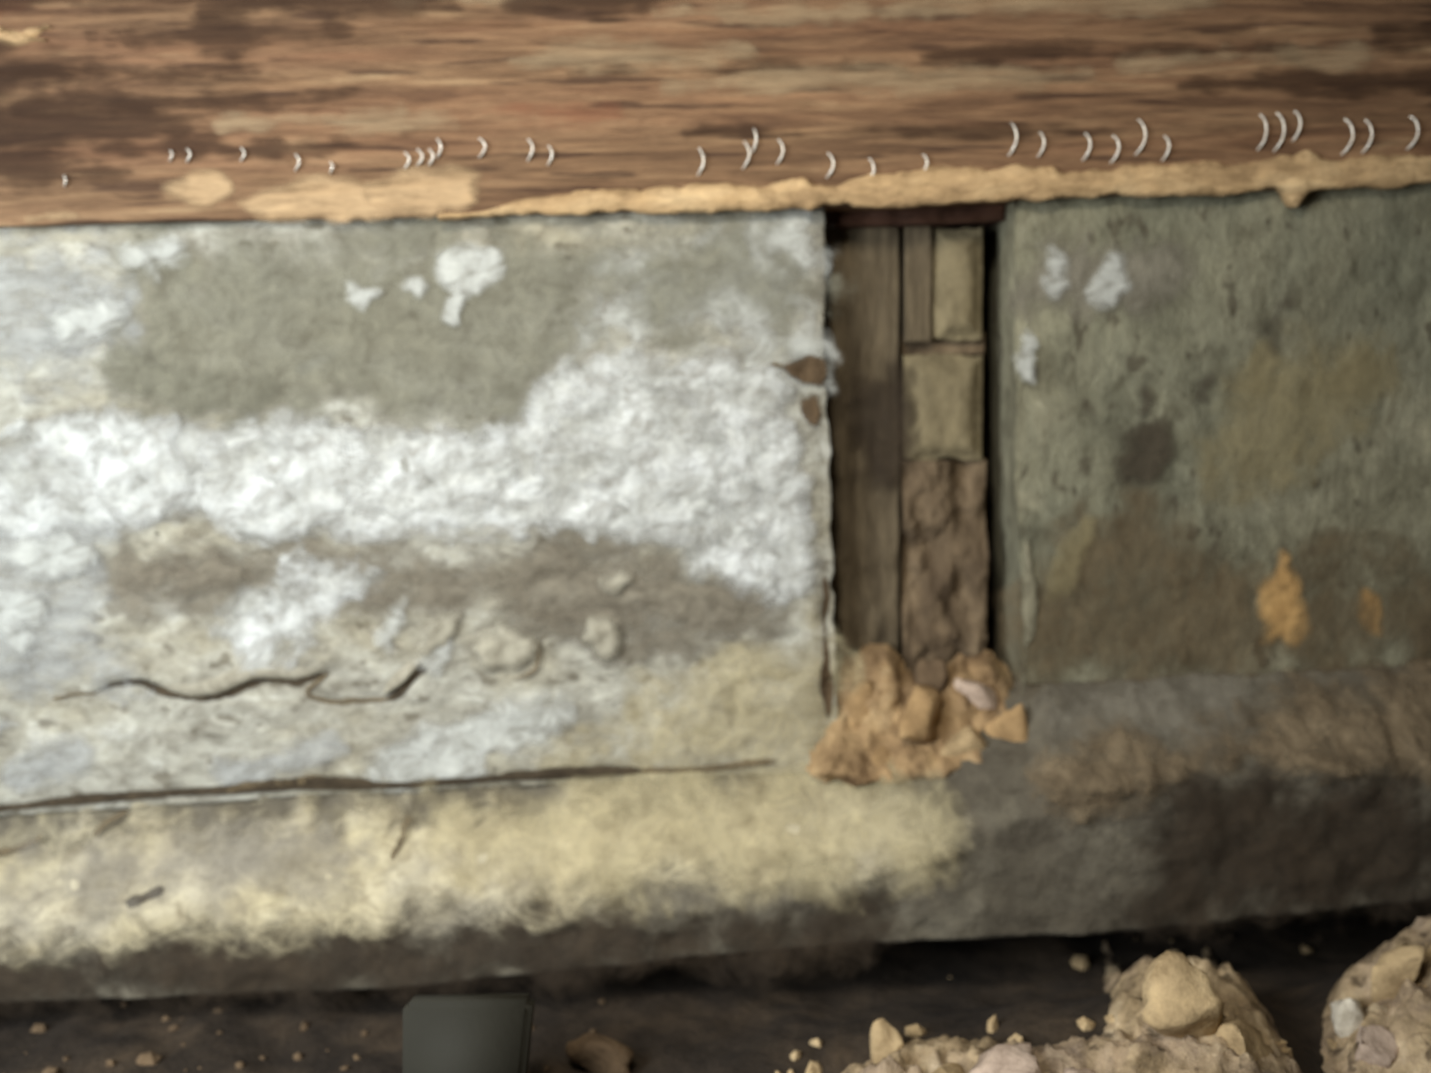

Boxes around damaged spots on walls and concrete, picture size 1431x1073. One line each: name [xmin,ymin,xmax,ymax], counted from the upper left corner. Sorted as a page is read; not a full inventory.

damp [0,208,829,674]
corrosion [1259,553,1304,642]
crack [52,659,426,705]
damp [1008,384,1431,933]
crack [0,759,774,860]